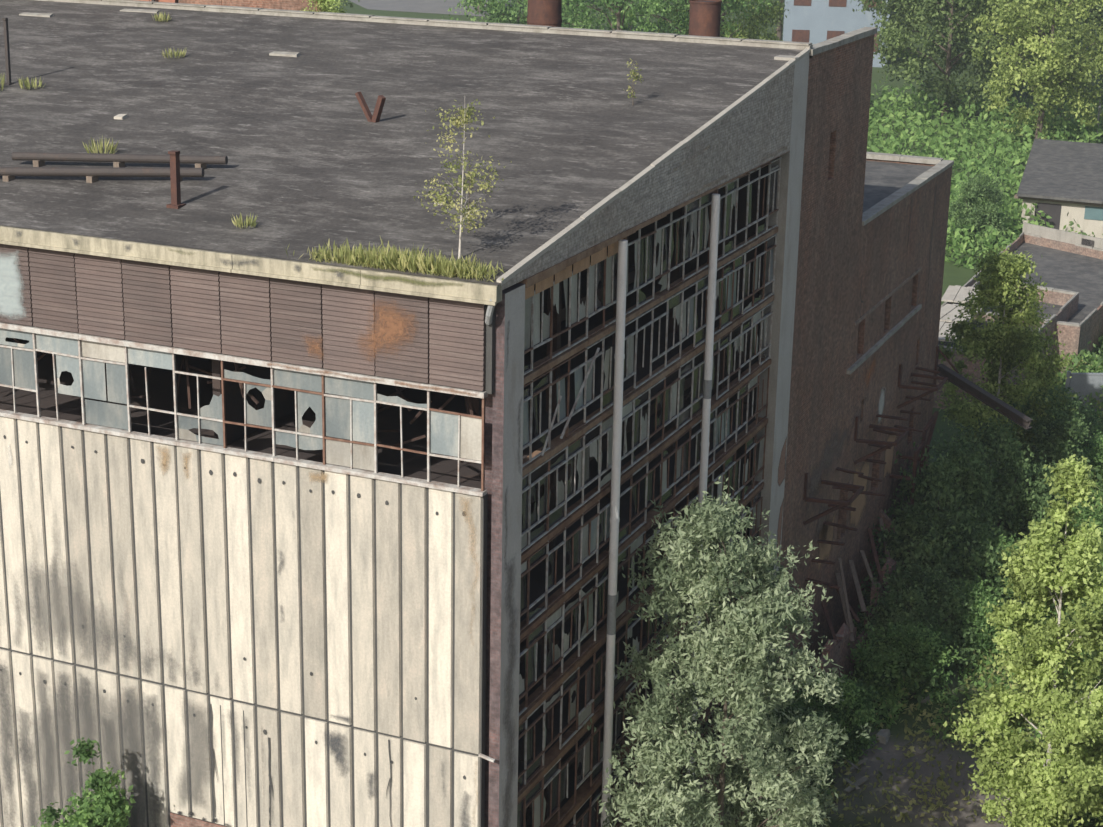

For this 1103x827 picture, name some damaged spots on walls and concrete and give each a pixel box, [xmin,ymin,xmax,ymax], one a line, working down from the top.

peeling [0,256,23,316]
corrosion [368,308,407,354]
leakage [329,735,344,767]